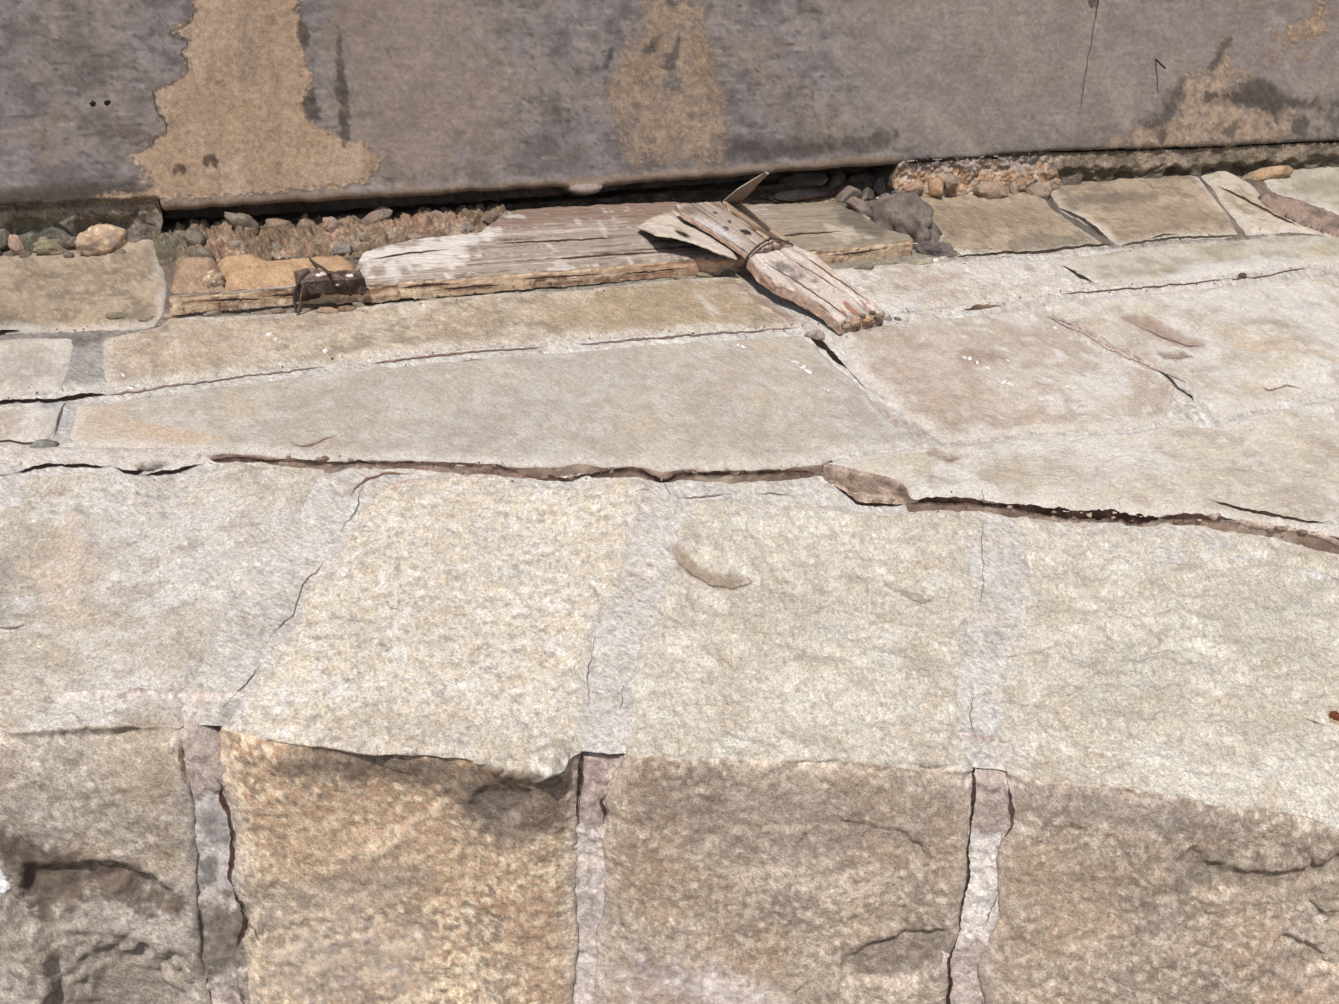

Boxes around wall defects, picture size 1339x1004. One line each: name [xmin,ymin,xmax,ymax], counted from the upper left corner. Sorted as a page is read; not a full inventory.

peeling [92,0,382,203]
crack [1080,0,1099,110]
crack [0,366,326,475]
crack [212,436,814,532]
crack [273,560,324,633]
crack [913,492,1333,614]